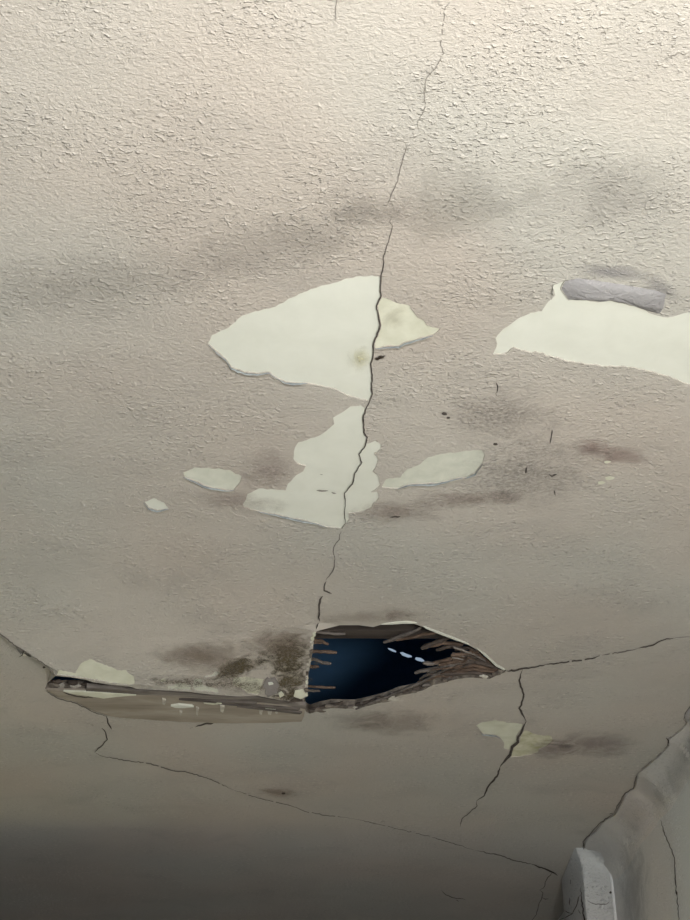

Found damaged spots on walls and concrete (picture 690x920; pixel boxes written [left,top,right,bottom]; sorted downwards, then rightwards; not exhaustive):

crack [316,5,448,629]
peeling [493,282,690,384]
peeling [209,276,485,530]
peeling [144,498,168,513]
peeling [183,467,242,494]
flaking render [47,632,357,723]
leakage [155,639,313,700]
flaking render [381,621,505,679]
crack [0,634,690,920]
peeling [476,720,553,757]